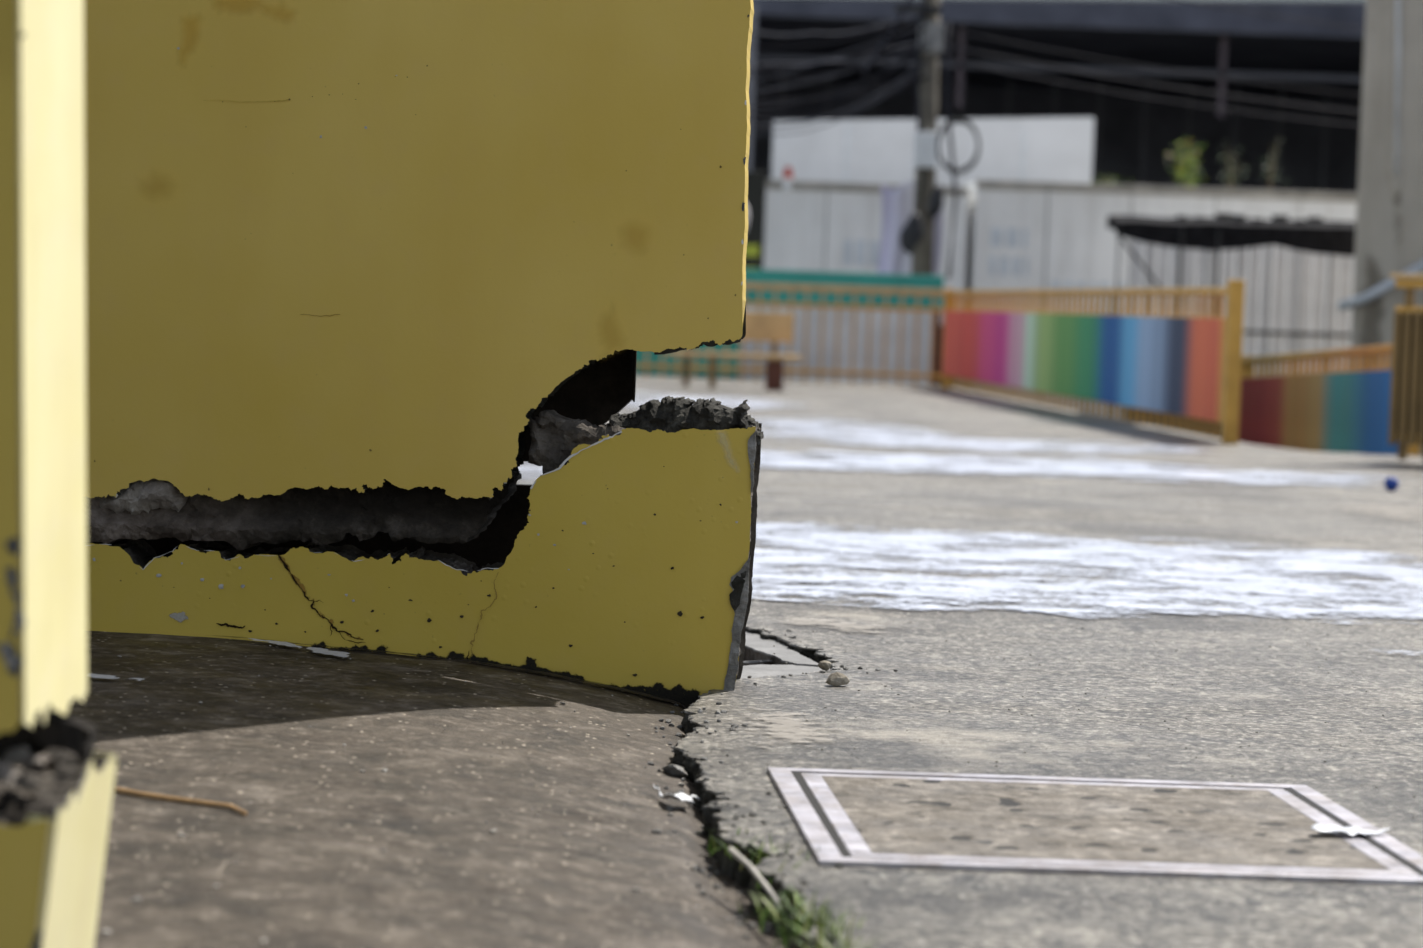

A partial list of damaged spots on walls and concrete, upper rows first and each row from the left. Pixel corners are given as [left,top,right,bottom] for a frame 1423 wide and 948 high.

crack [86,469,522,643]
crack [0,707,97,790]